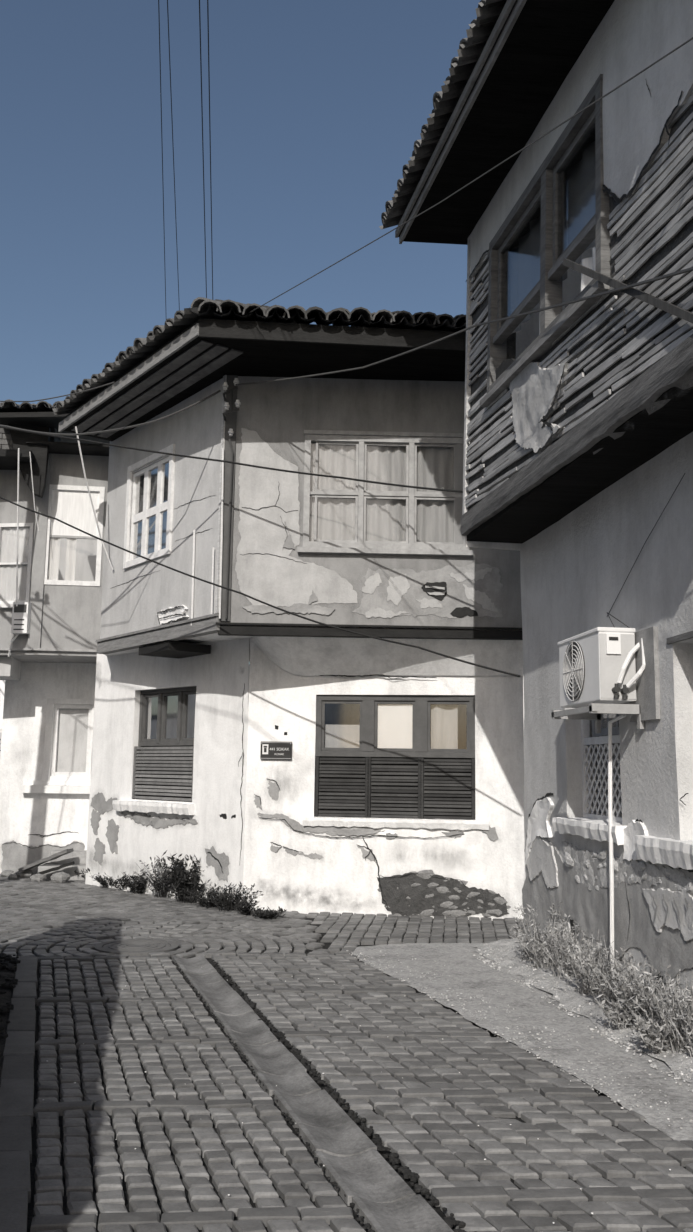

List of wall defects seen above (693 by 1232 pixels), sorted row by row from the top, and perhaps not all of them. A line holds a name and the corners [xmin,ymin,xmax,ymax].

flaking render [602,91,683,204]
flaking render [495,358,516,379]
peeling [536,365,565,454]
crack [240,486,303,563]
peeling [235,428,504,619]
peeling [1,792,198,874]
flaking render [254,779,464,863]
crack [362,836,466,908]
flaking render [482,826,498,841]
peeling [522,792,693,987]